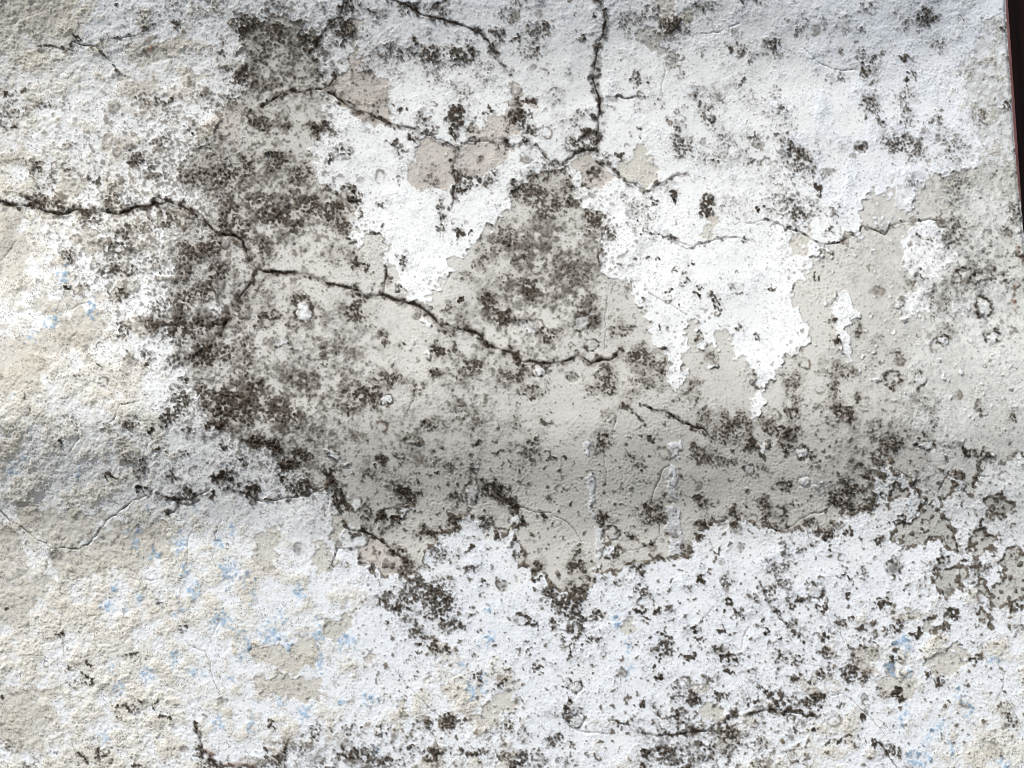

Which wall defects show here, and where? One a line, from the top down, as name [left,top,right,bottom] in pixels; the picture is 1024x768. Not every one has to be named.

crack [46,23,153,74]
peeling [120,25,193,99]
crack [0,193,624,368]
leakage [385,85,493,159]
crack [260,0,685,200]
leakage [510,109,624,238]
peeling [156,0,1024,636]
crack [649,232,745,249]
crack [764,217,934,245]
leakage [78,144,486,655]
leakage [671,369,800,465]
leakage [469,465,923,768]